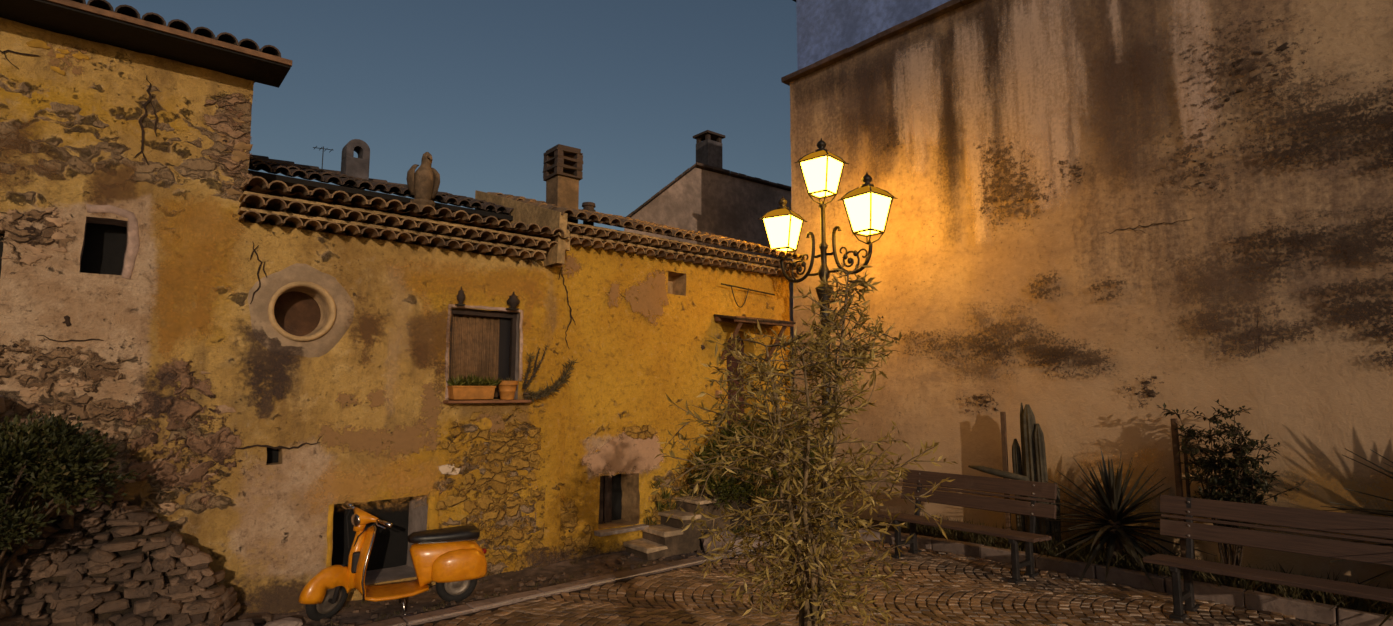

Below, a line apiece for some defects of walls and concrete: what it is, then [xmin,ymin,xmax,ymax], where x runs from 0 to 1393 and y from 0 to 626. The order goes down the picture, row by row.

crack [134,75,158,165]
spalling [204,93,254,196]
damp [796,0,1084,242]
damp [1236,70,1393,170]
crack [250,241,267,304]
damp [239,322,303,418]
damp [902,271,1116,380]
damp [1175,206,1393,368]
spalling [0,338,254,512]
crack [229,425,327,457]
spalling [419,382,584,576]
spalling [581,424,696,526]